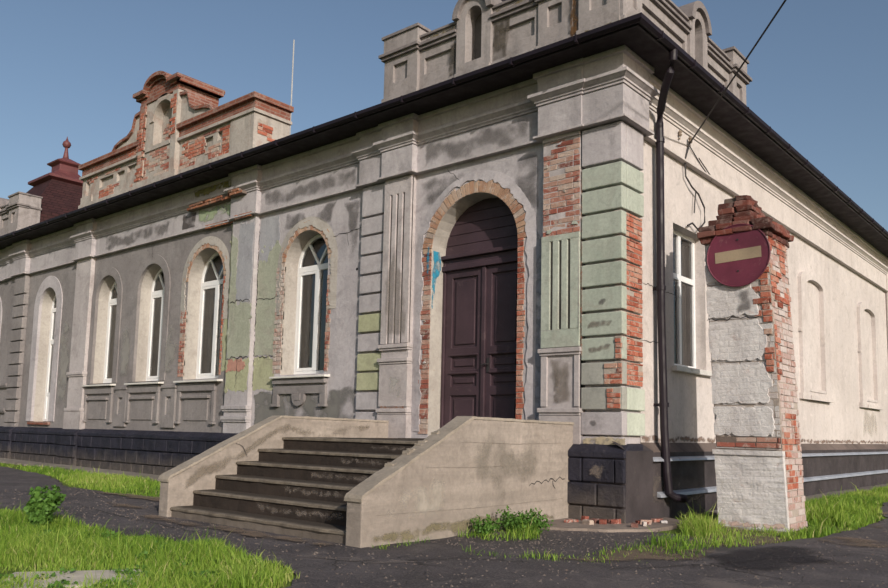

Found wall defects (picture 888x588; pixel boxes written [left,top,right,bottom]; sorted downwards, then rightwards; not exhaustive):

rust [570,0,578,37]
flaking render [87,93,231,199]
flaking render [257,119,275,142]
peeling [177,211,338,393]
flaking render [402,137,582,455]
flaking render [604,210,643,409]
flaking render [752,236,791,381]
crack [377,477,565,516]